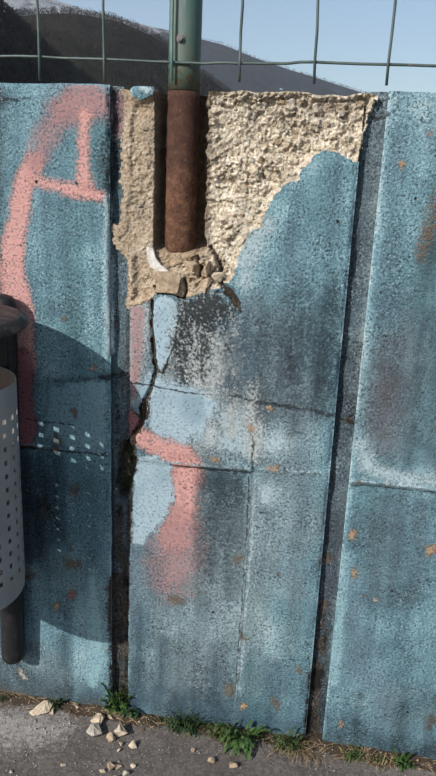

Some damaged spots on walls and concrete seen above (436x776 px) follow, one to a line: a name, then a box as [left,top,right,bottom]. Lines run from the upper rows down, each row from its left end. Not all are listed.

spalling [103,86,378,463]
crack [98,300,210,446]
water stain [165,289,266,464]
crack [126,486,134,565]